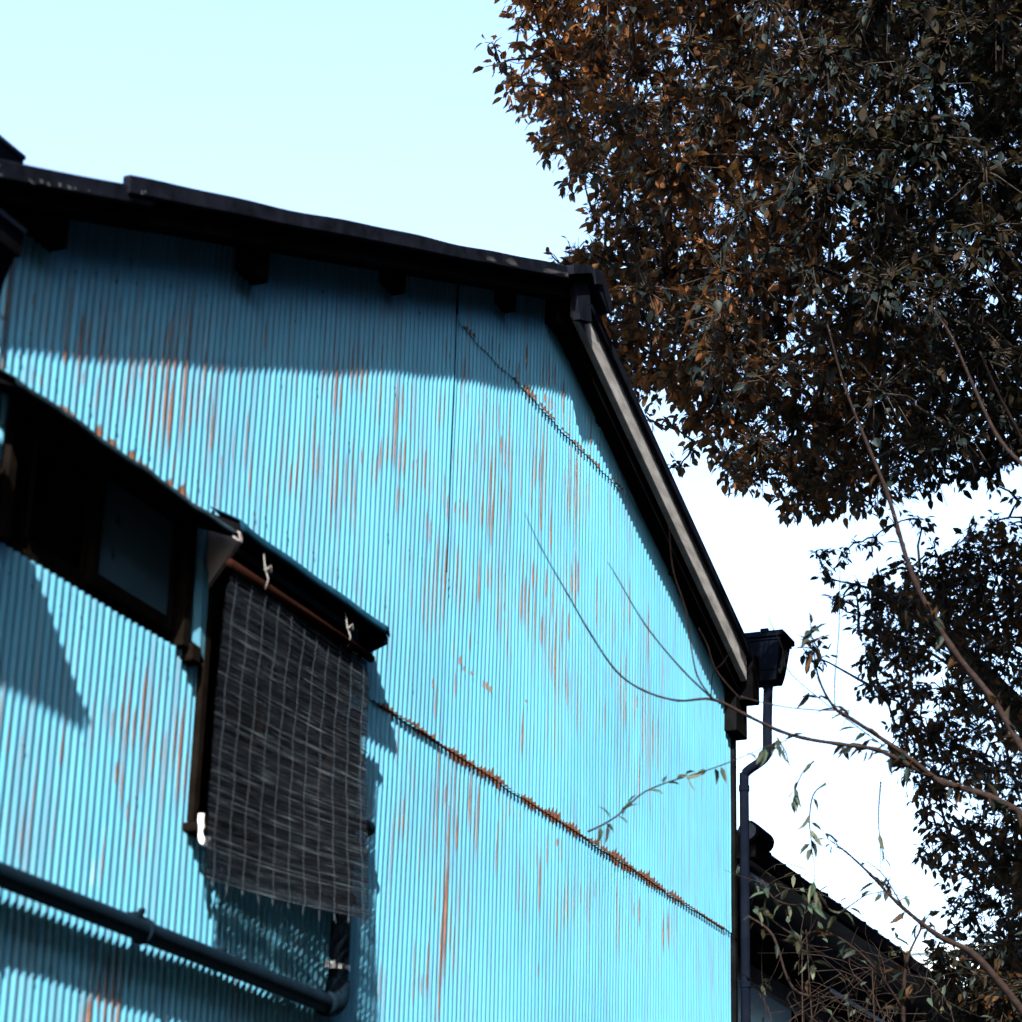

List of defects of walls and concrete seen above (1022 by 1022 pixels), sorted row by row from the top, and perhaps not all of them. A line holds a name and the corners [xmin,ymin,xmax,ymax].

rust [1,261,19,369]
rust [45,288,132,407]
rust [95,425,117,448]
rust [124,302,252,504]
rust [320,303,383,412]
rust [266,337,600,749]
rust [596,589,630,639]
rust [104,667,190,863]
rust [611,651,659,794]
rust [376,701,725,1022]
rust [80,947,129,1022]